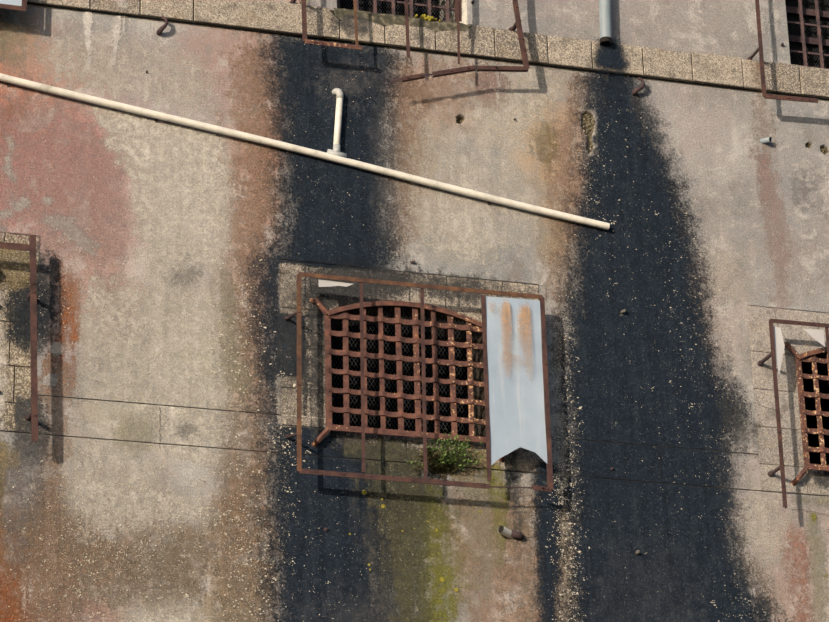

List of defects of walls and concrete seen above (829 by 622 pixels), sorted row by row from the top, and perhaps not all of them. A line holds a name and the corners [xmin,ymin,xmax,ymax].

water stain [0,395,50,524]
water stain [6,245,65,356]
water stain [209,14,486,622]
water stain [484,39,780,622]